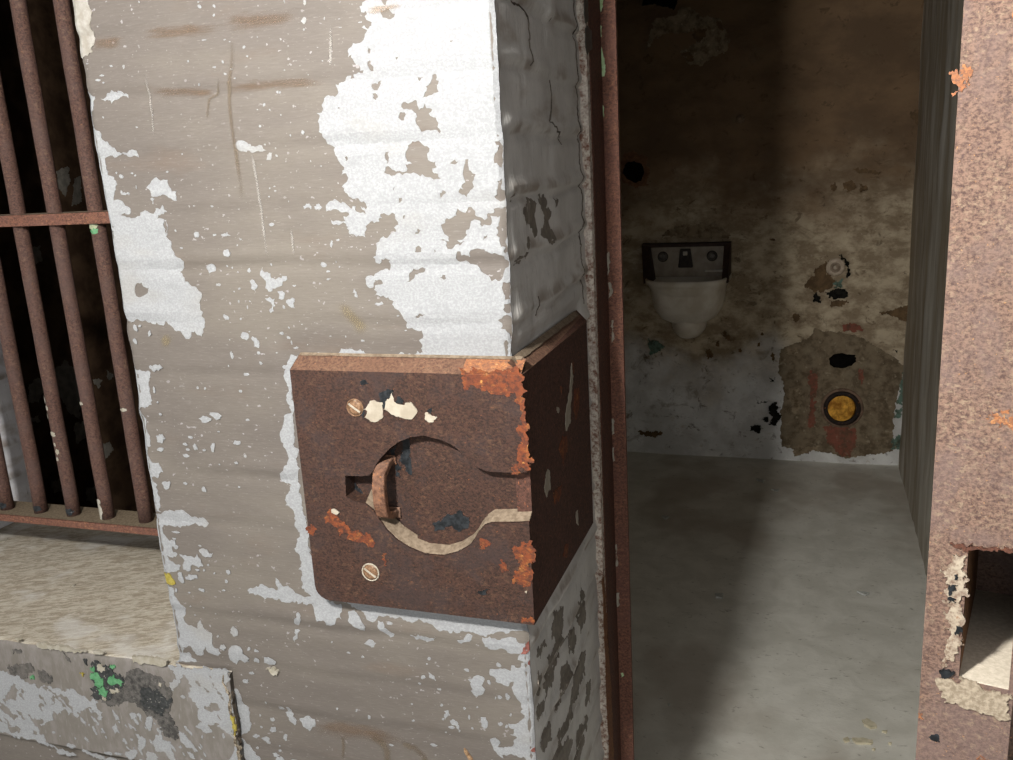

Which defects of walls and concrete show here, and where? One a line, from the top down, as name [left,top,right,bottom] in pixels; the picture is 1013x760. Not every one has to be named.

rust [949,64,973,96]
peeling [88,65,205,344]
peeling [303,0,558,356]
rust [620,150,651,188]
peeling [206,233,296,320]
peeling [228,331,263,367]
spalling [829,353,856,368]
peeling [0,360,316,760]
peeling [248,324,591,760]
peeling [947,574,958,603]
rust [602,577,614,760]
peeling [939,669,955,679]